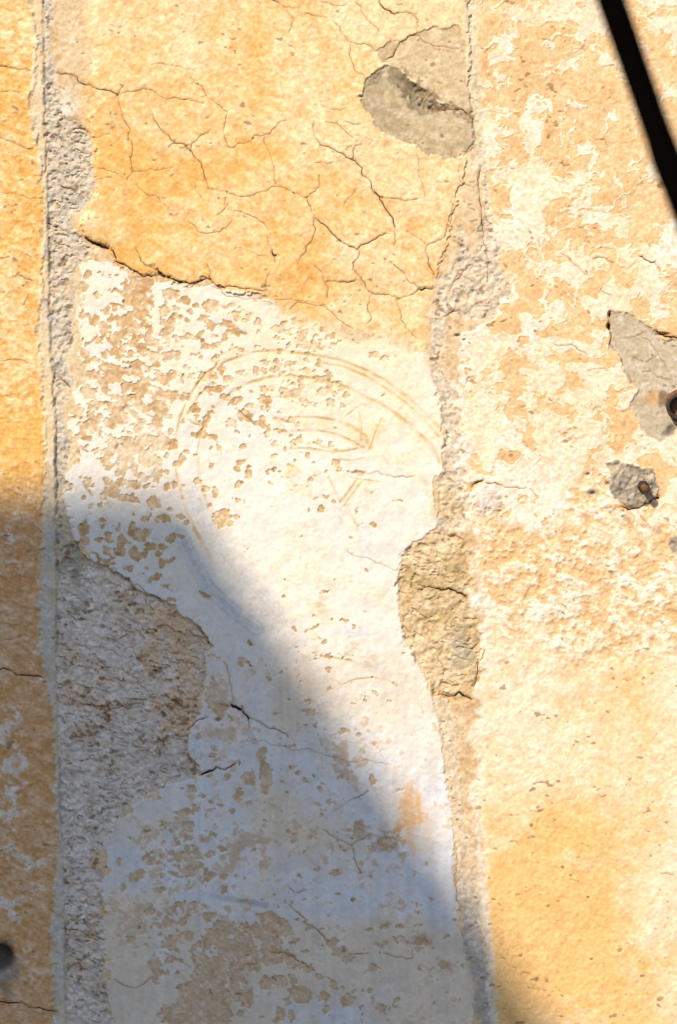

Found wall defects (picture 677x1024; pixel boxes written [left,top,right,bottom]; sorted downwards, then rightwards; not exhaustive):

crack [273,0,449,79]
crack [48,73,489,339]
peeling [434,0,677,543]
flaking render [45,81,401,1024]
peeling [365,898,434,972]